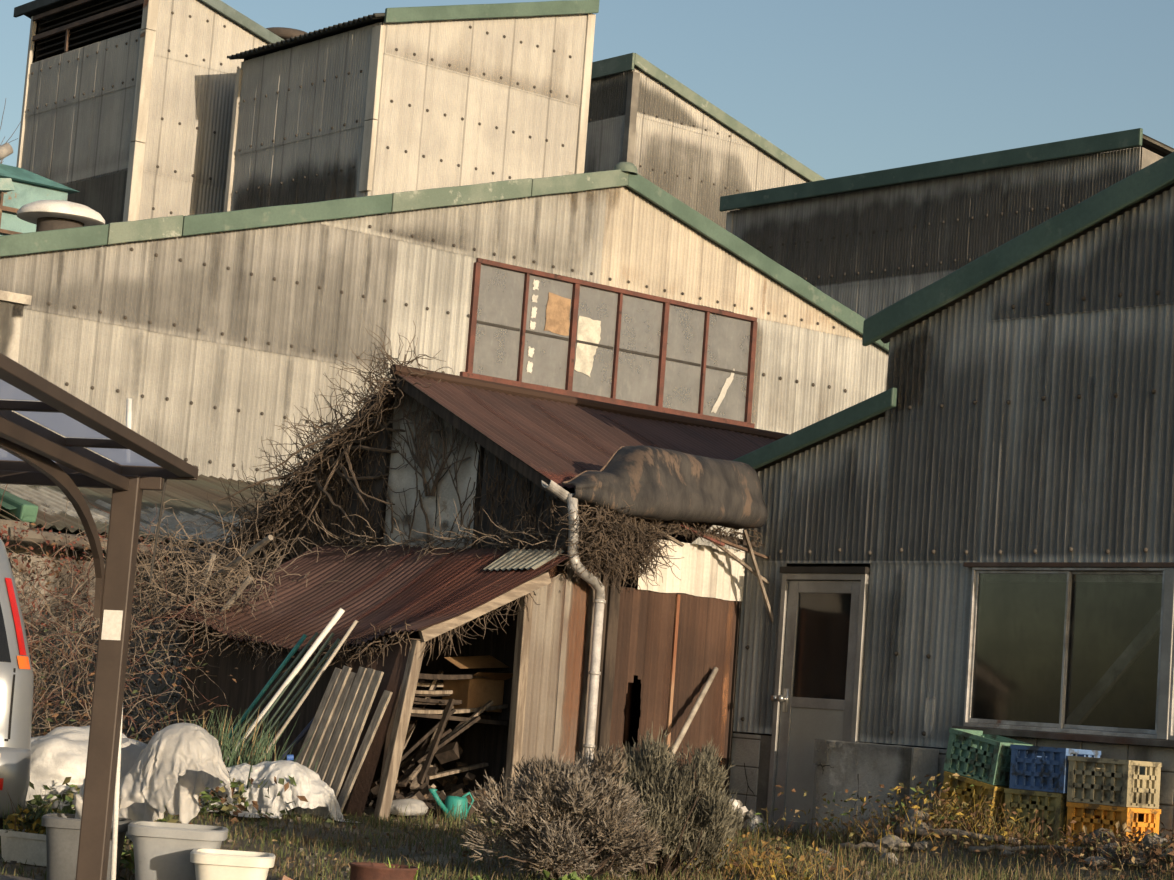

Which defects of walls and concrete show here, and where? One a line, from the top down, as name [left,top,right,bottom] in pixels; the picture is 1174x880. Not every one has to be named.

leakage [588,80,696,127]
leakage [234,167,356,211]
leakage [642,145,744,230]